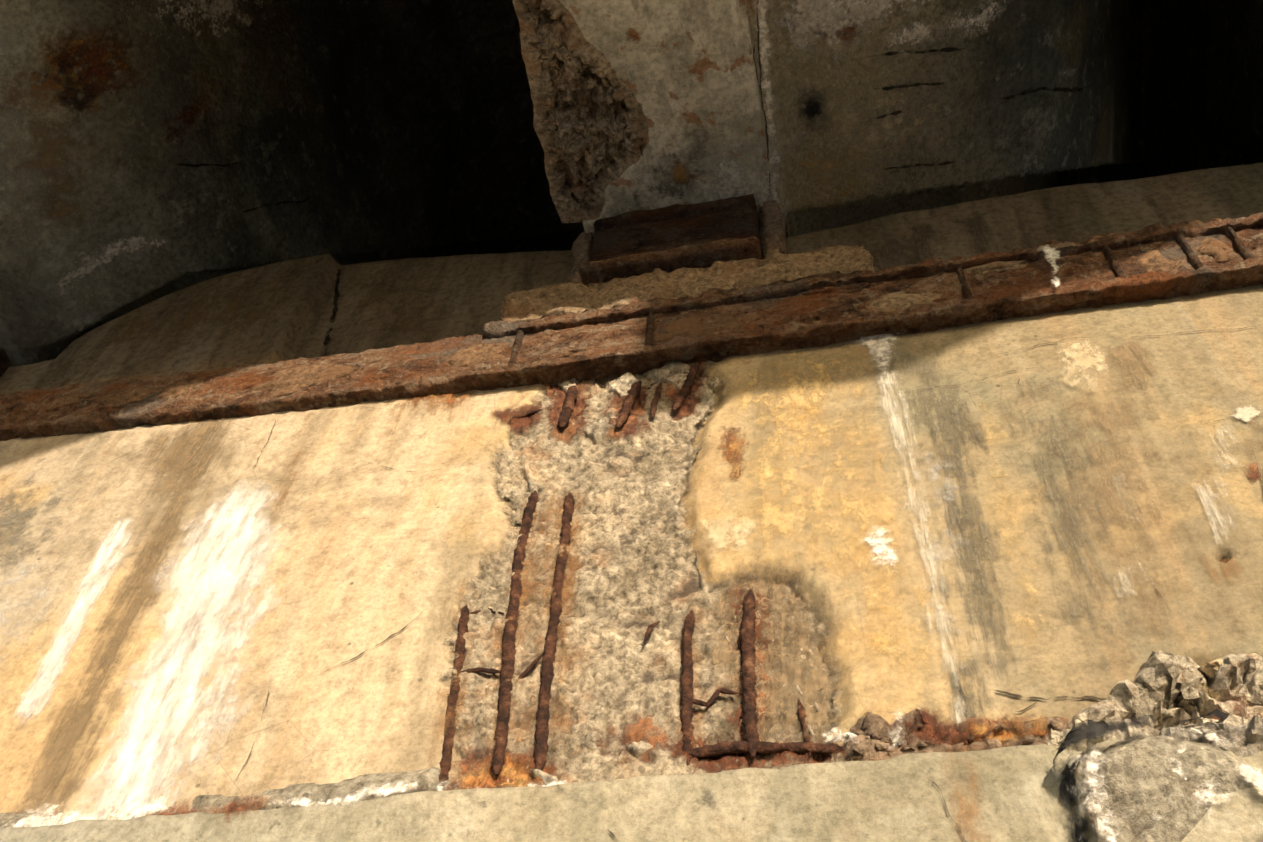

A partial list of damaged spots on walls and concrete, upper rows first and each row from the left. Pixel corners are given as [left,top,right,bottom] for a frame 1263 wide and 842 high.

spalling [512,0,650,223]
crack [753,1,771,196]
crack [870,47,962,119]
crack [316,261,341,356]
rust [491,381,592,442]
rust [603,360,707,439]
leakage [856,333,991,478]
leakage [0,480,61,565]
leakage [13,418,268,827]
spalling [439,360,1263,790]
leakage [927,611,1007,723]
rust [887,709,1050,745]